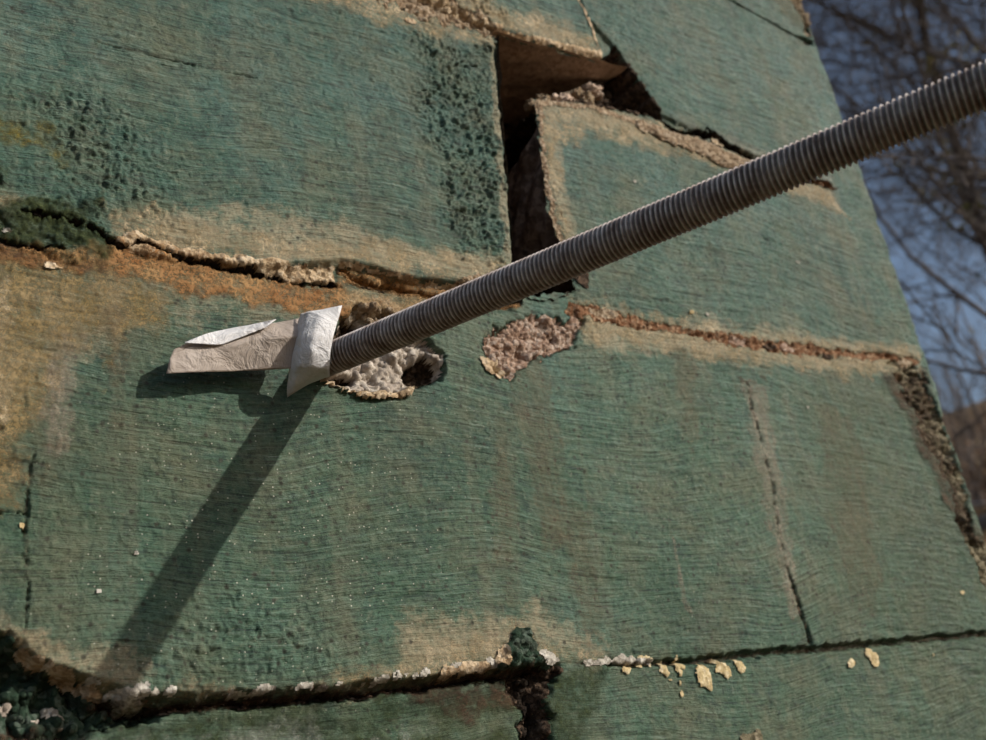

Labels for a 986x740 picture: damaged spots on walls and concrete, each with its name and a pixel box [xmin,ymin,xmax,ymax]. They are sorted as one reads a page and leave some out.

peeling [377,0,602,60]
crack [636,119,752,169]
crack [805,179,838,191]
crack [0,208,446,300]
spalling [333,301,393,339]
spalling [320,339,443,400]
spalling [480,301,986,587]
crack [86,661,538,722]
peeling [361,644,512,688]
peeling [583,653,746,697]
crack [661,589,986,665]
peeling [862,647,879,667]